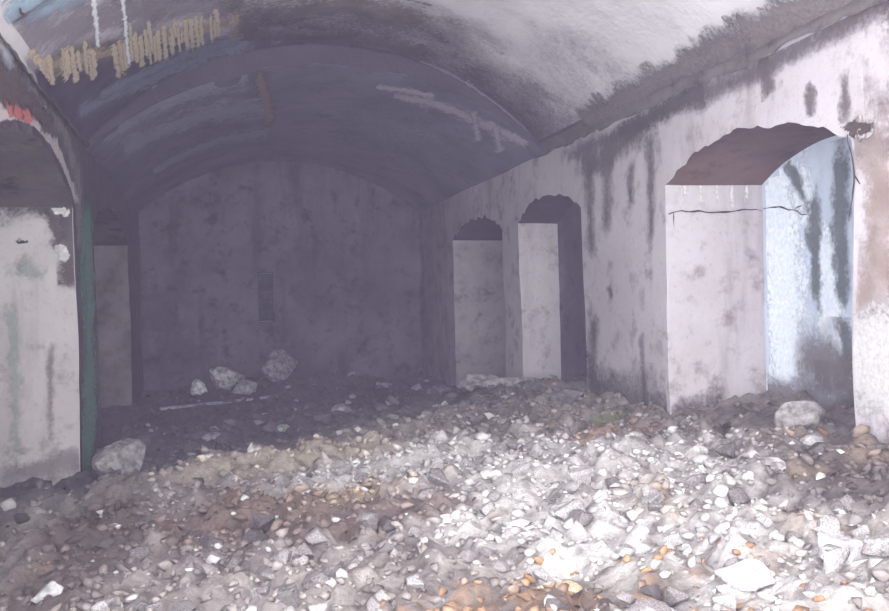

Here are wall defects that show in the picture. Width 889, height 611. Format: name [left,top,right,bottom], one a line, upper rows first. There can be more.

damp [102,74,269,175]
damp [77,0,568,144]
damp [568,0,889,254]
spalling [840,115,874,143]
crack [668,205,807,224]
damp [765,138,854,409]